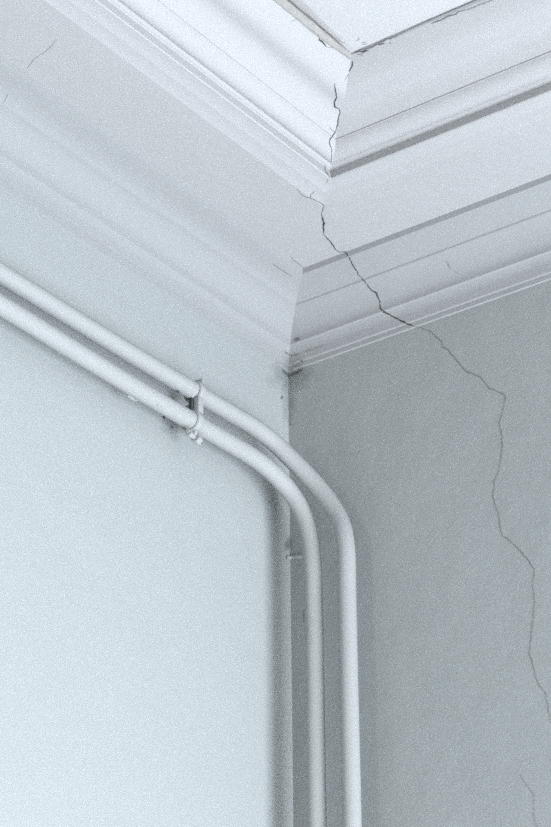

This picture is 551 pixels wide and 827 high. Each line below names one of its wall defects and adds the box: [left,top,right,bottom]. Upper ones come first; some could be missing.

spalling [274,0,351,59]
crack [298,0,551,722]